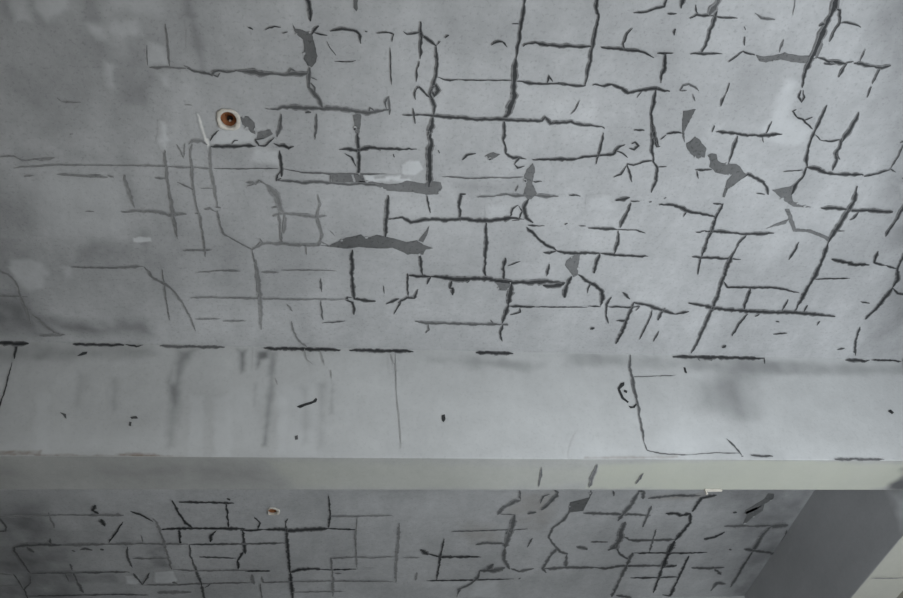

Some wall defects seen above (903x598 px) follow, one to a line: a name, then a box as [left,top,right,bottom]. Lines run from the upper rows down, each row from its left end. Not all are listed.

spalling [292,23,317,67]
spalling [682,109,746,198]
spalling [320,227,432,256]
crack [835,455,884,463]
spalling [568,491,593,513]
crack [0,464,788,598]